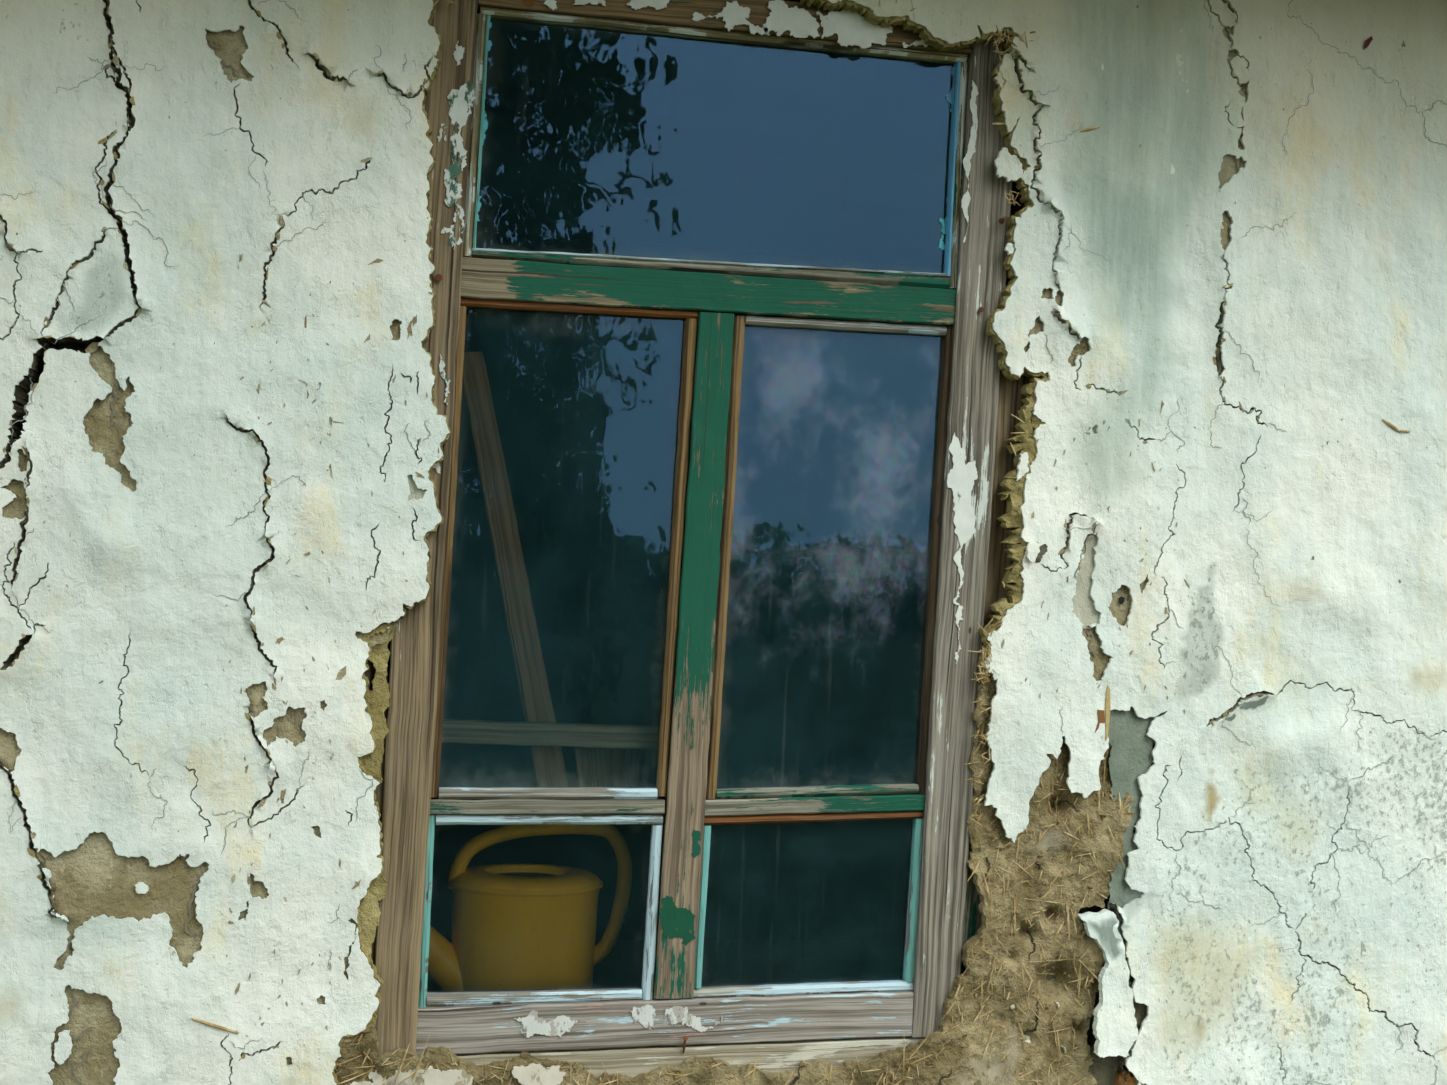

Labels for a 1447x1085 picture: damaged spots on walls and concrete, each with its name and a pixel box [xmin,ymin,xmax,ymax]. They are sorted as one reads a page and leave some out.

spalling [205,26,254,83]
crack [0,0,174,670]
spalling [83,342,137,492]
crack [1011,50,1296,665]
crack [215,414,304,674]
spalling [1061,527,1168,688]
crack [0,761,65,920]
spalling [35,831,209,1085]
crack [114,635,310,853]
peeling [512,1063,566,1085]
peeling [515,1010,577,1038]
crack [1155,643,1447,1085]